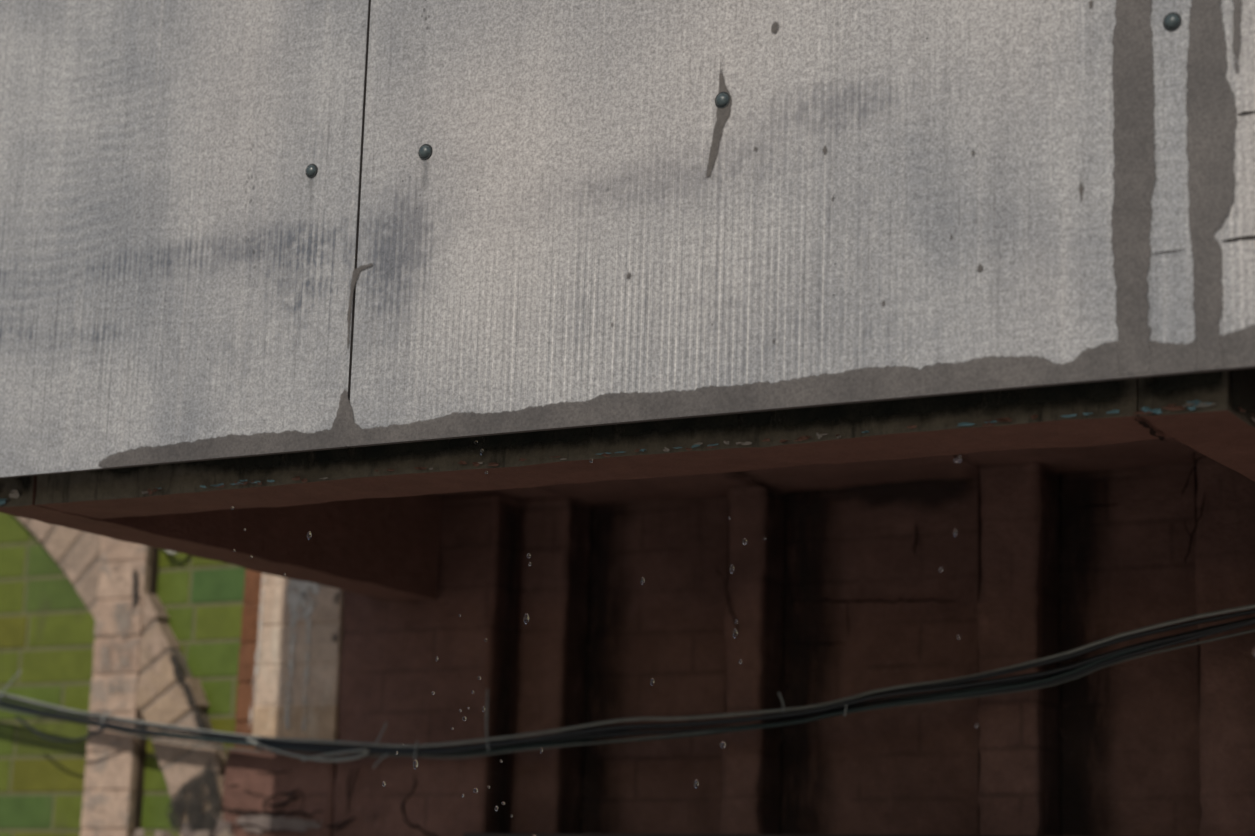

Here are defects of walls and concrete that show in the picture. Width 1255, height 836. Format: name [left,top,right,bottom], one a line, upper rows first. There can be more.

leakage [95,0,1255,476]
leakage [796,478,969,508]